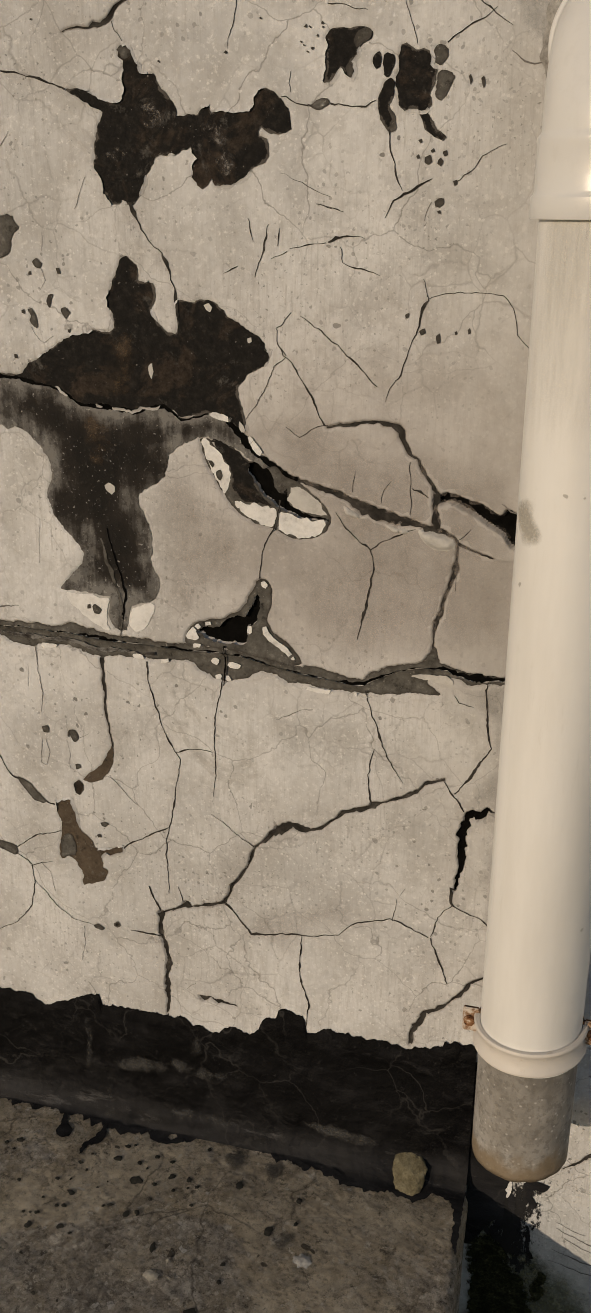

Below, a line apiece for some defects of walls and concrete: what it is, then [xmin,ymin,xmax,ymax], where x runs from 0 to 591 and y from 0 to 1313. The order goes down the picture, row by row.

crack [0,70,65,90]
crack [62,0,126,41]
spalling [66,43,291,206]
spalling [300,21,486,166]
crack [406,0,542,64]
crack [128,202,179,317]
crack [223,129,506,276]
spalling [0,256,505,697]
crack [246,279,529,648]
crack [0,645,114,779]
crack [122,661,495,1044]
damp [441,1042,577,1313]